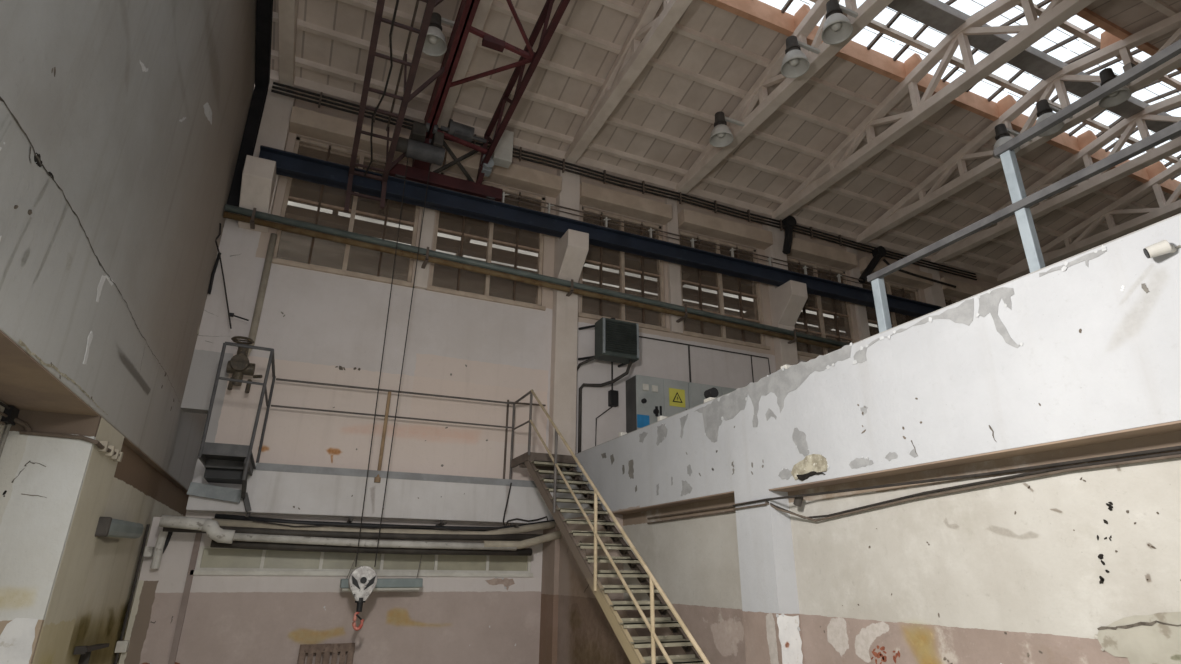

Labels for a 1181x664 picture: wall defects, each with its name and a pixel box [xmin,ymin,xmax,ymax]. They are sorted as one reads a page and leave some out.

crack [0,97,180,402]
peeling [639,287,1023,453]
peeling [656,452,714,496]
spalling [778,427,830,481]
peeling [849,427,918,469]
spalling [1097,502,1136,584]
peeling [820,605,893,664]
corrosion [871,645,900,664]